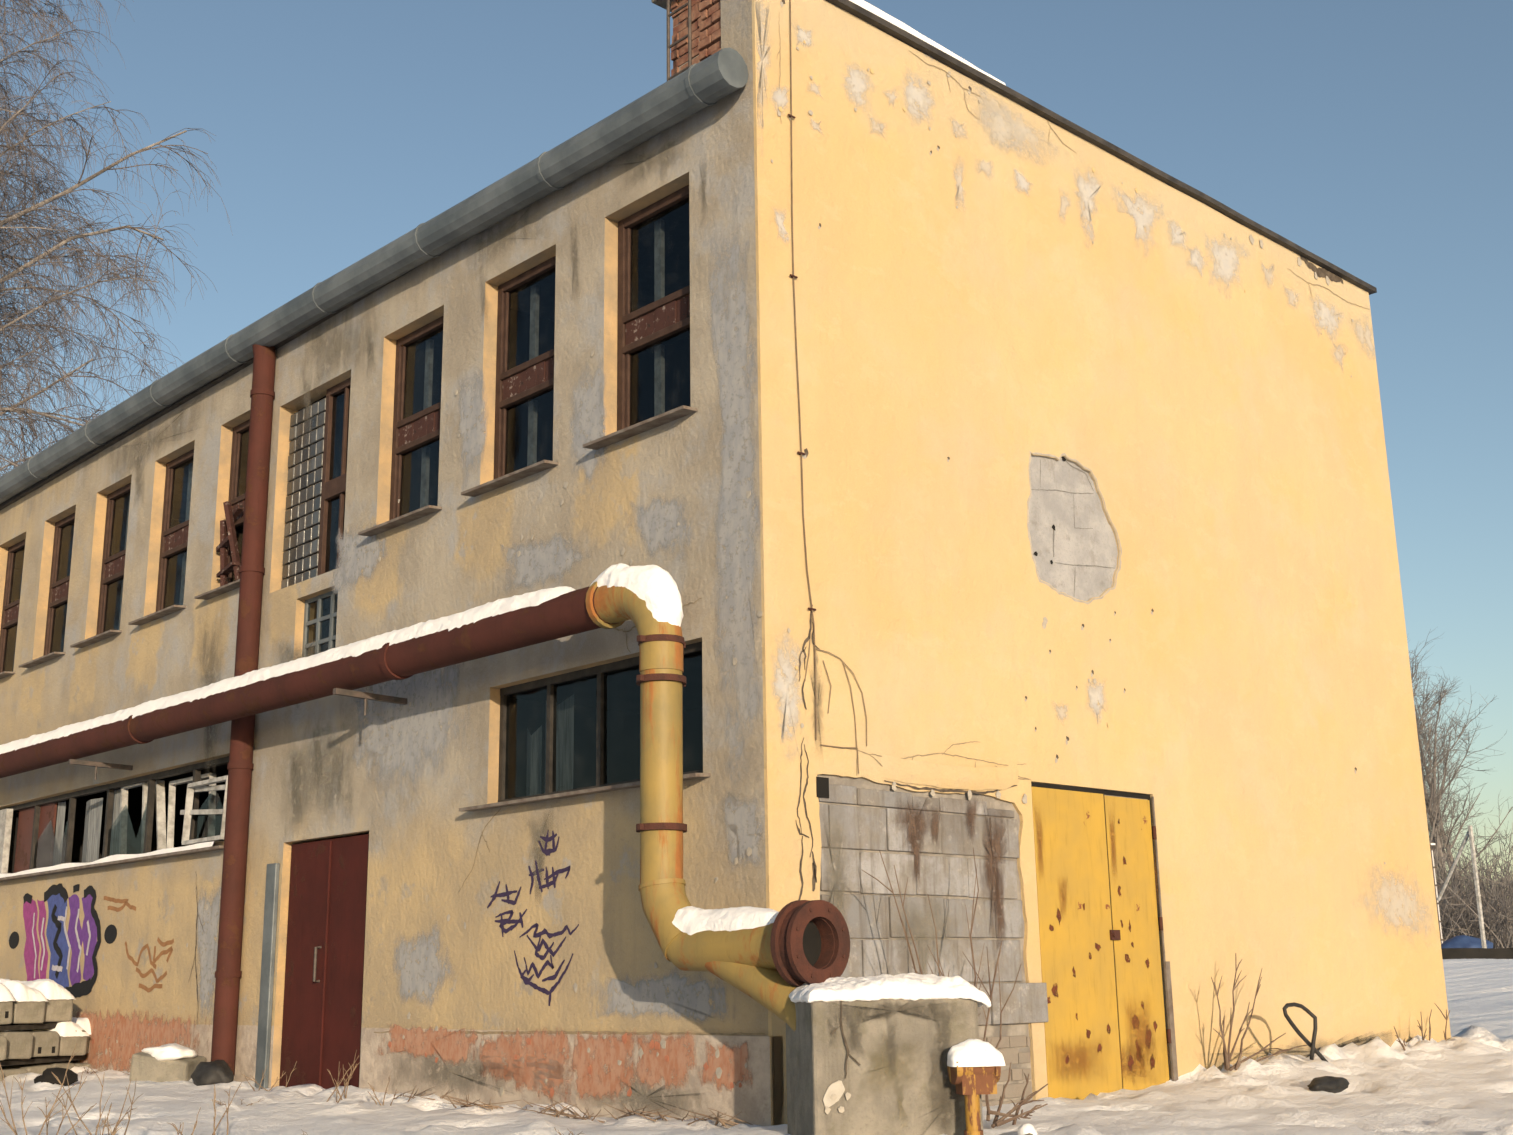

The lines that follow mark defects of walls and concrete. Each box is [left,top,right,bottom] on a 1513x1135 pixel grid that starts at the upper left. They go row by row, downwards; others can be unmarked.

peeling [755,0,791,120]
peeling [886,71,951,155]
peeling [1060,167,1100,244]
peeling [1119,182,1374,378]
spalling [1027,450,1122,616]
peeling [1075,670,1110,727]
spalling [816,777,829,798]
crack [796,605,1031,900]
corrosion [1110,819,1126,864]
peeling [381,914,752,1100]
corrosion [1065,1013,1111,1069]
corrosion [1120,1001,1157,1074]